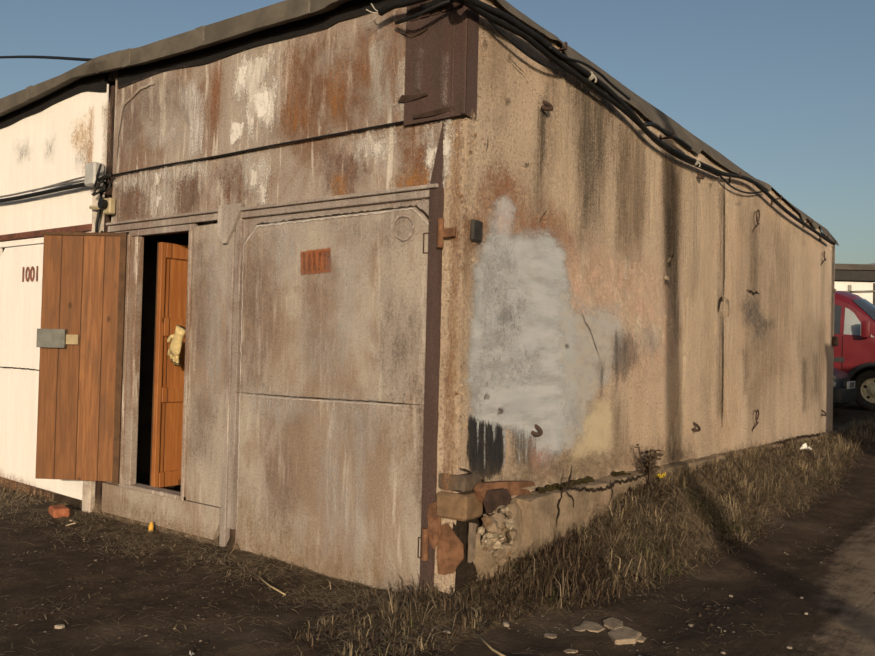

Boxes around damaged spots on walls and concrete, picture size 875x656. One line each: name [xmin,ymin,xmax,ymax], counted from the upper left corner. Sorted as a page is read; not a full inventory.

rust [280,29,387,139]
spalling [467,498,529,581]